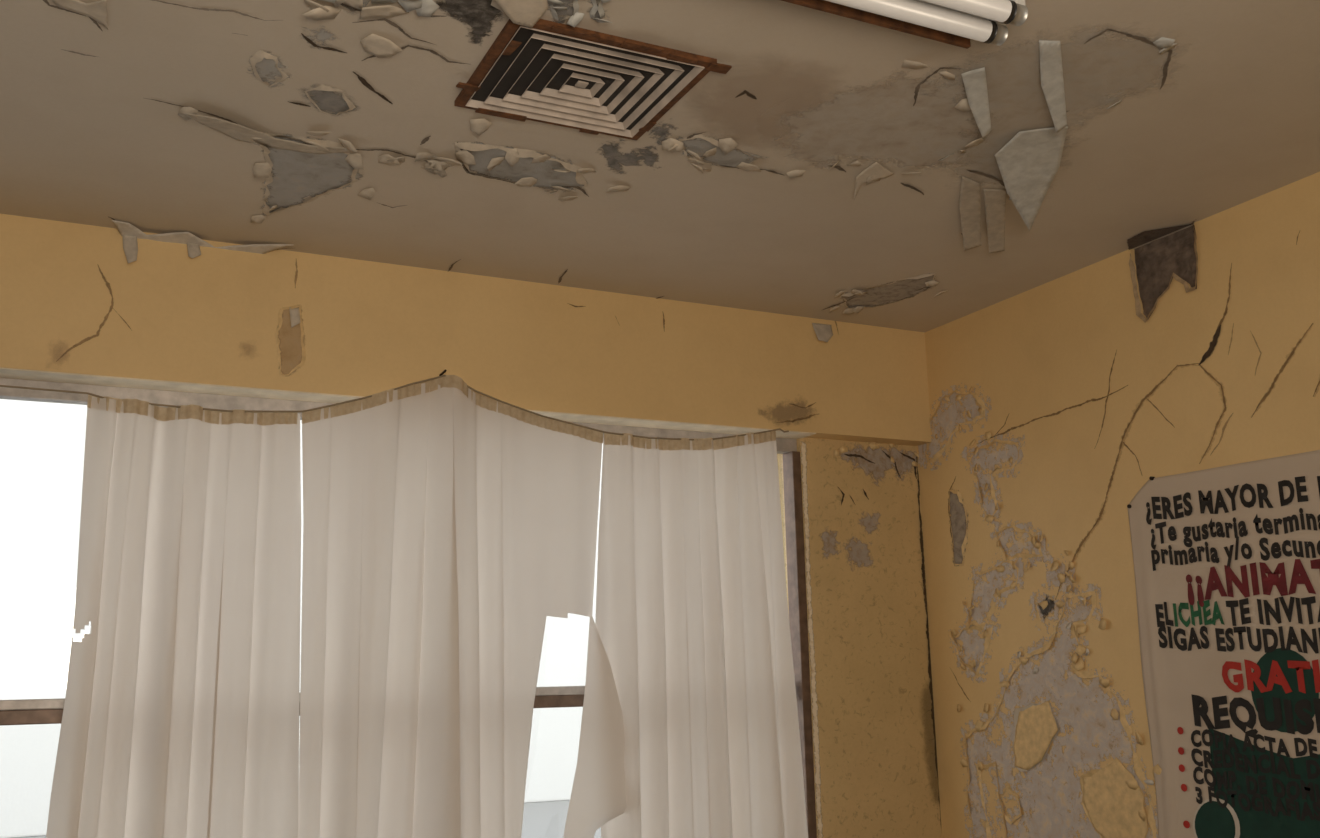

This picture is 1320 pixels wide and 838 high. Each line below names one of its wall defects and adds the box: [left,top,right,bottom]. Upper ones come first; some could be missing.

peeling [301,0,440,58]
peeling [547,0,612,27]
peeling [1084,29,1177,89]
peeling [146,98,783,223]
peeling [959,40,1068,254]
crack [56,264,131,362]
peeling [110,217,292,263]
peeling [275,305,306,376]
flaking render [1127,221,1198,323]
crack [977,264,1313,600]
peeling [801,442,920,838]
peeling [948,489,1162,838]